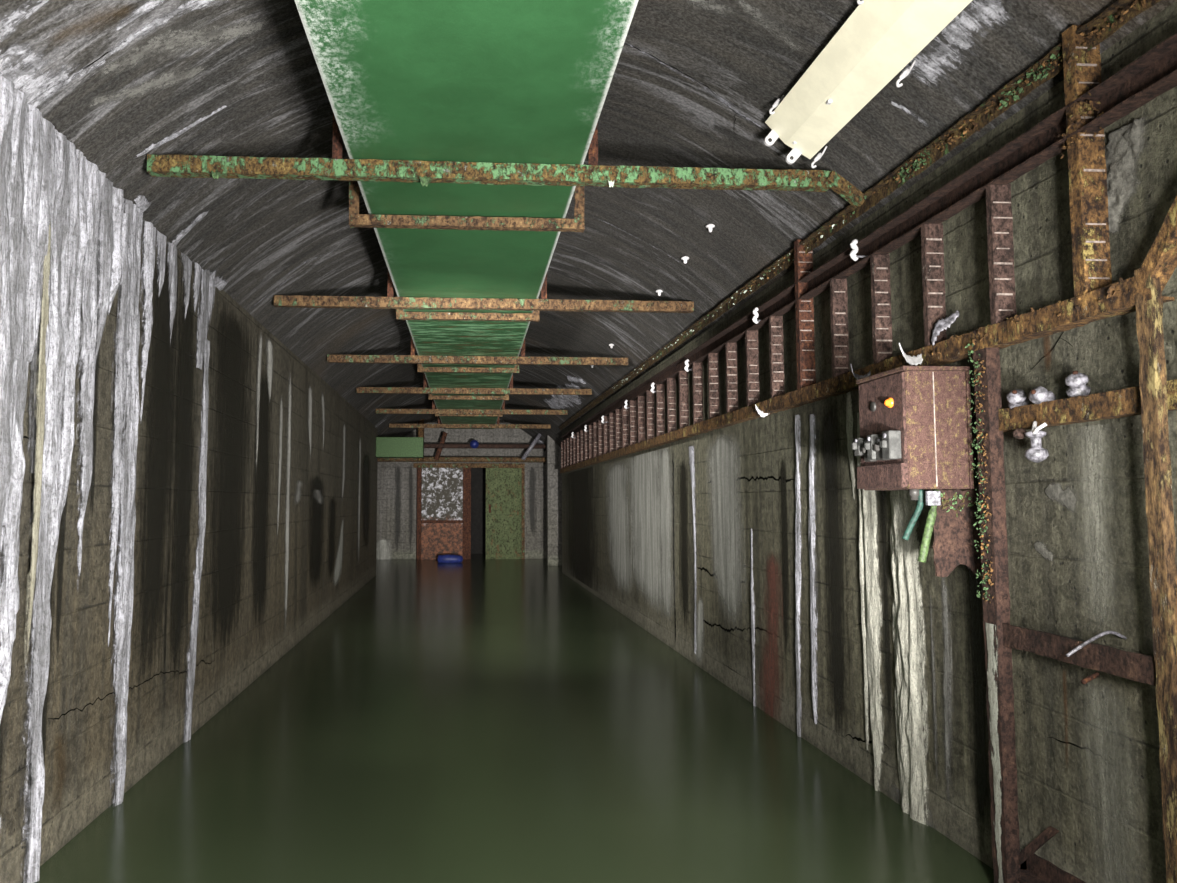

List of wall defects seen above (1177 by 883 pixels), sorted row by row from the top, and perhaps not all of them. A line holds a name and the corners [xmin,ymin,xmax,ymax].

corrosion [1058,92,1104,166]
corrosion [1098,277,1136,304]
water stain [0,0,346,883]
water stain [358,440,413,559]
water stain [568,446,703,660]
water stain [710,437,756,707]
water stain [779,392,952,829]